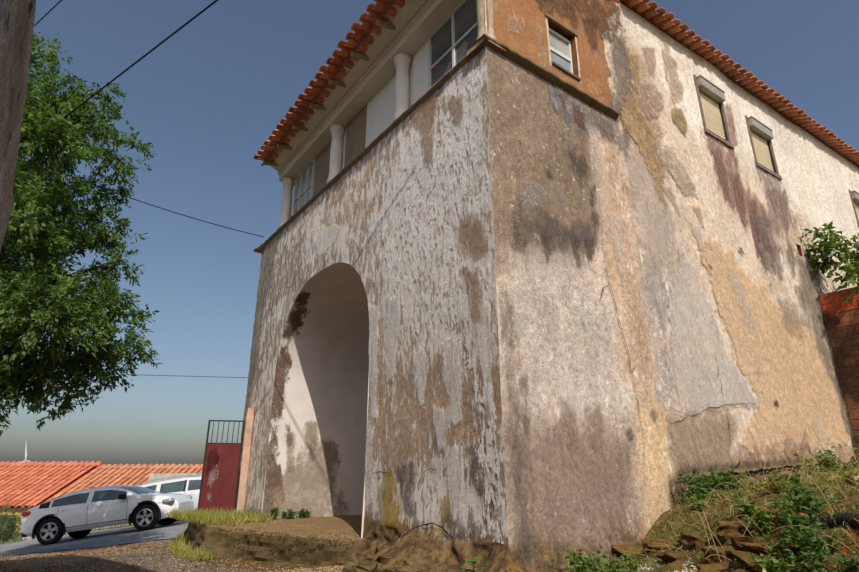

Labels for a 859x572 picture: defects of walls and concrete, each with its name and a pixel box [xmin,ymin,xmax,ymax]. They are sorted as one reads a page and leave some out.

leakage [536,0,634,176]
peeling [362,65,504,544]
leakage [514,180,622,273]
leakage [702,105,859,448]
crack [667,358,800,480]